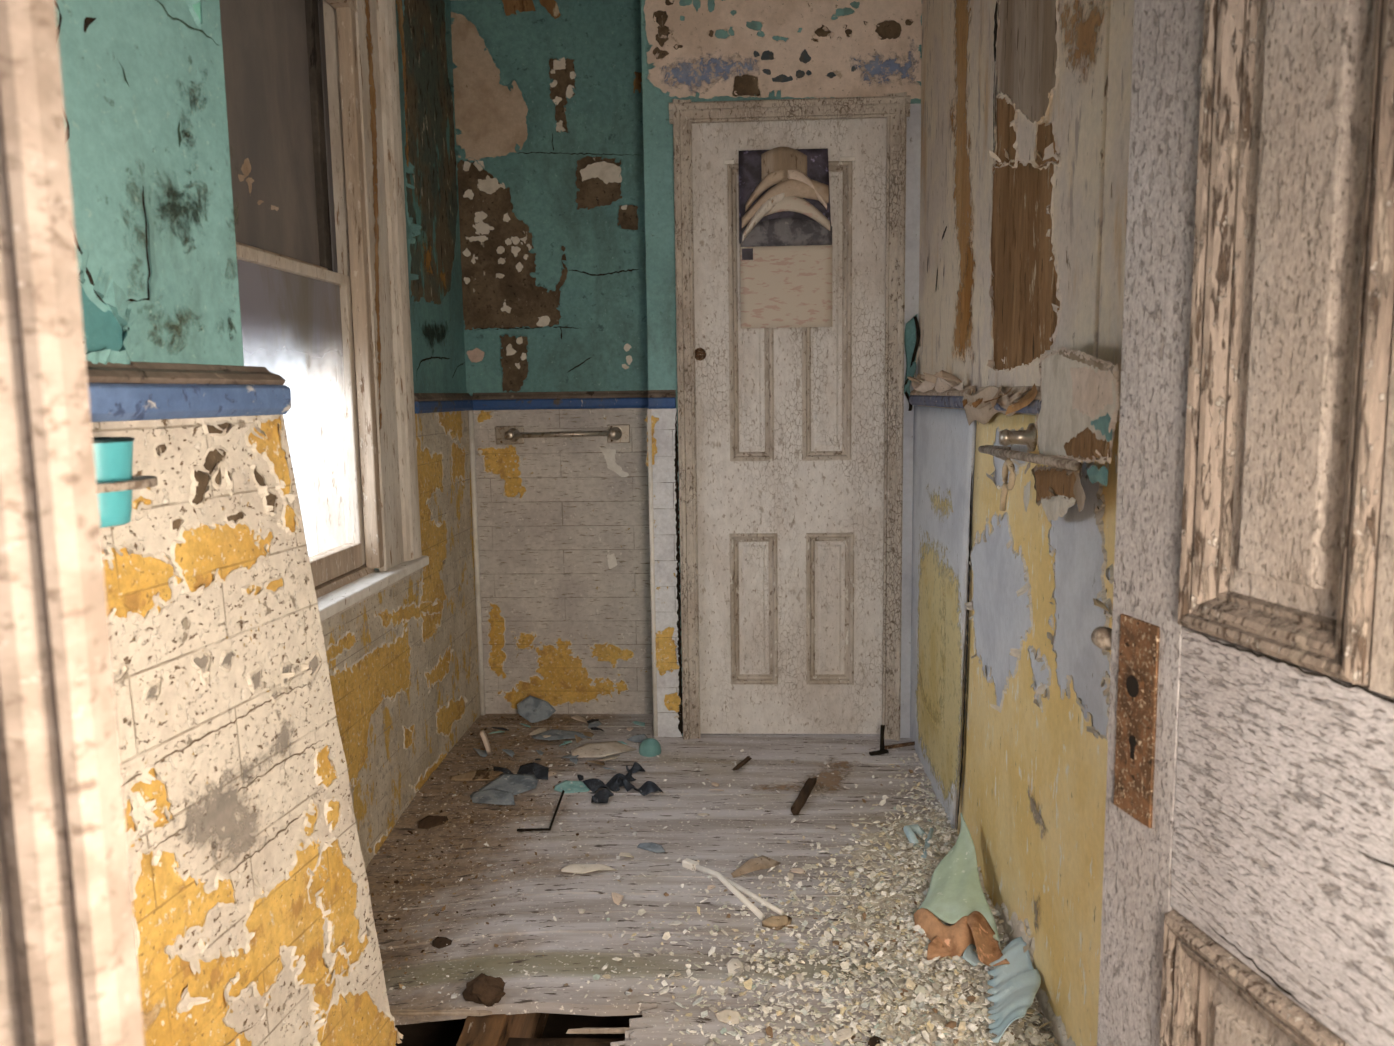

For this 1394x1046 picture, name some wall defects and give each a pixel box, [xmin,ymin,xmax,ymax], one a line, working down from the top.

crack [55,0,96,38]
crack [156,0,220,46]
peeling [632,0,922,102]
crack [75,185,158,318]
leakage [159,184,206,249]
peeling [400,0,570,393]
peeling [574,154,639,232]
leakage [152,314,191,344]
peeling [904,0,1119,741]
peeling [102,410,681,1046]
crack [1353,848,1394,868]
crack [1208,924,1313,1013]